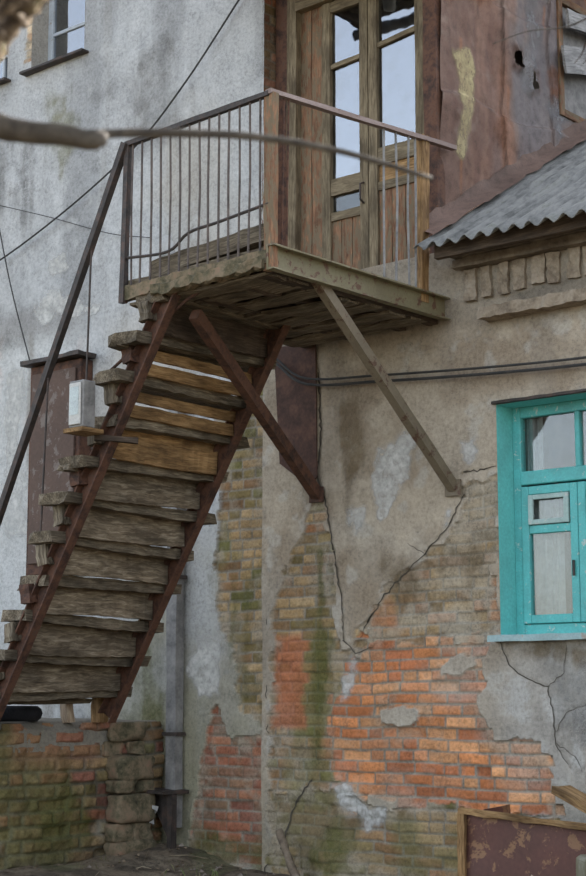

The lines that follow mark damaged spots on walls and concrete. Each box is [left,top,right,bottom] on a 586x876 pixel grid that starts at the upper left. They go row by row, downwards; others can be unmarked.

spalling [23,21,32,65]
peeling [521,0,540,91]
crack [317,372,465,654]
spalling [186,414,567,876]
crack [500,642,585,771]